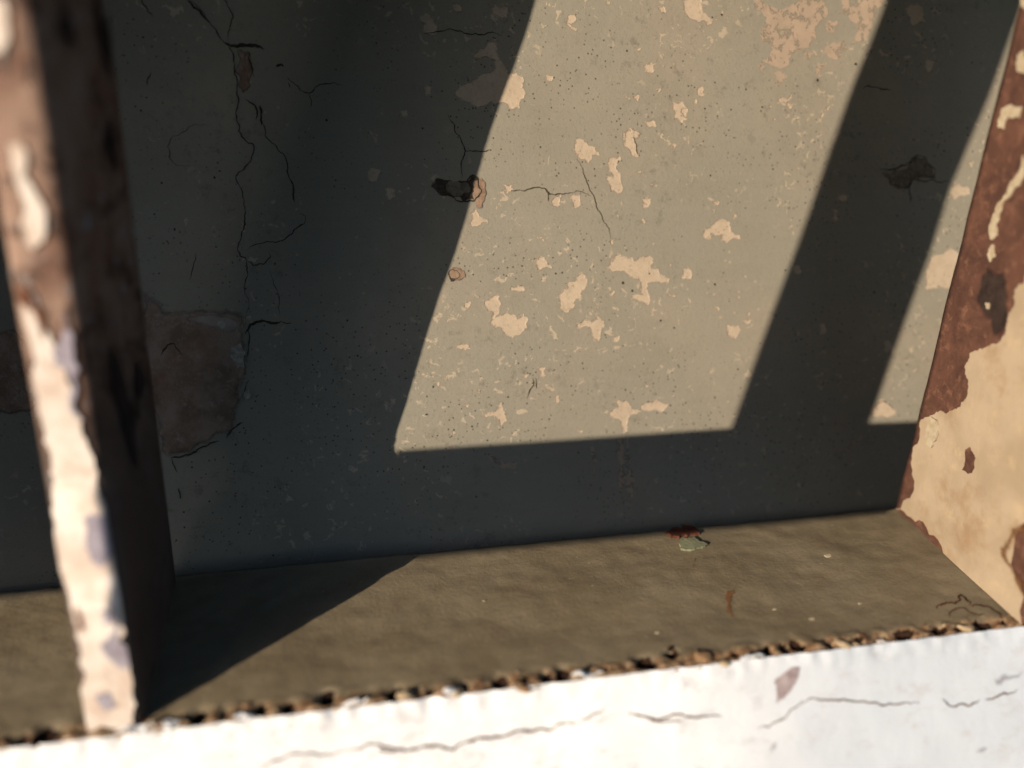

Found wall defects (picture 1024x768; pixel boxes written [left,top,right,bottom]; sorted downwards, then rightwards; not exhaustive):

peeling [9,142,47,250]
crack [514,187,590,199]
peeling [987,156,1024,262]
crack [167,0,340,499]
peeling [924,248,958,290]
rust [978,270,1007,333]
peeling [0,284,295,740]
rust [1001,527,1022,588]
spalling [492,668,607,694]
spalling [694,640,805,703]
crack [759,698,913,728]
crack [942,690,1017,708]